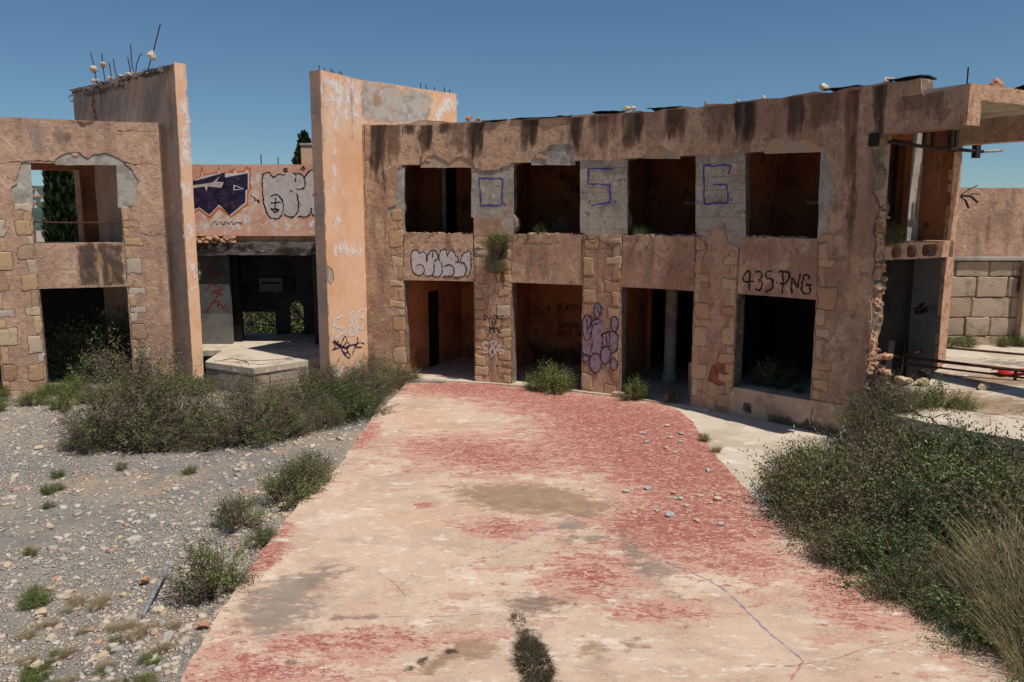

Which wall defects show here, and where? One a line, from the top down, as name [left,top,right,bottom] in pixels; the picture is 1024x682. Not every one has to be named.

leakage [370,125,385,188]
flaking render [319,65,458,191]
leakage [402,123,449,149]
leakage [469,122,484,158]
leakage [521,119,538,147]
leakage [570,116,583,148]
leakage [623,112,643,147]
leakage [666,108,685,139]
leakage [735,101,756,140]
leakage [787,96,805,132]
flaking render [55,152,139,209]
flaking render [531,143,628,236]